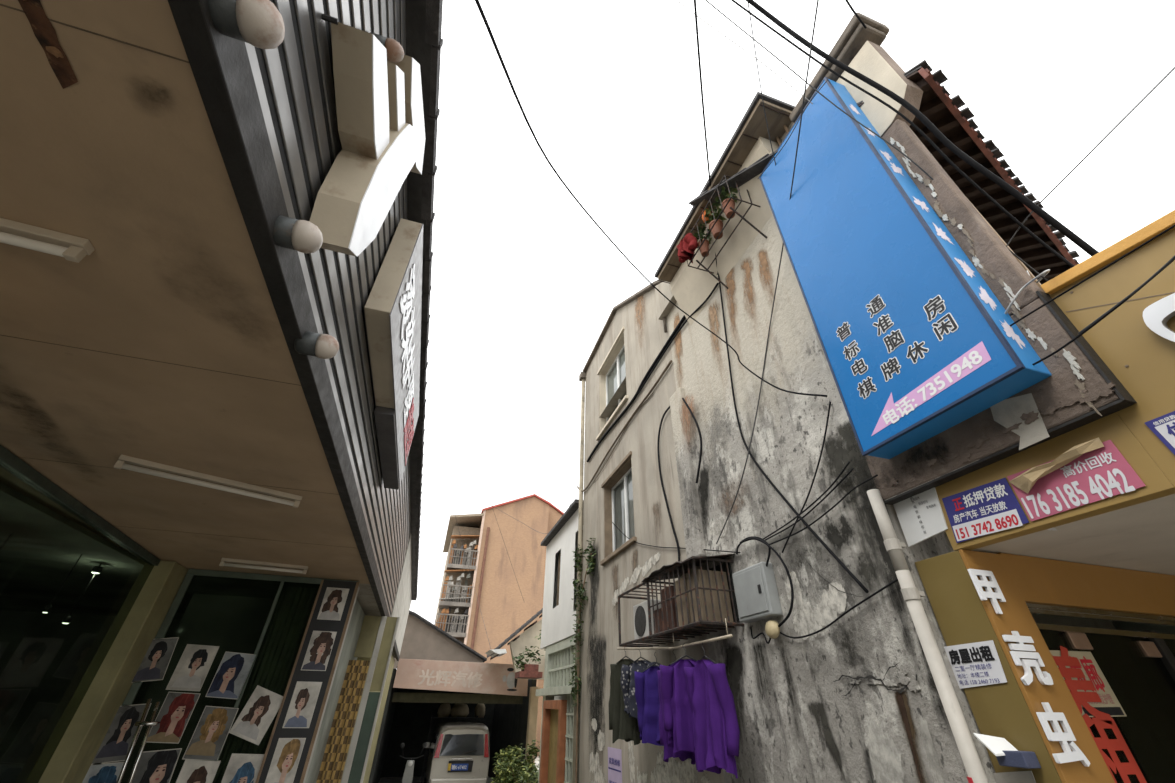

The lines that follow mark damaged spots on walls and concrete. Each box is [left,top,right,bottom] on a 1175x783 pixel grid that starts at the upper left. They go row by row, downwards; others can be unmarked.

rust [18,0,78,89]
leakage [689,468,708,533]
leakage [725,643,767,744]
leakage [782,650,798,727]
leakage [808,703,846,782]